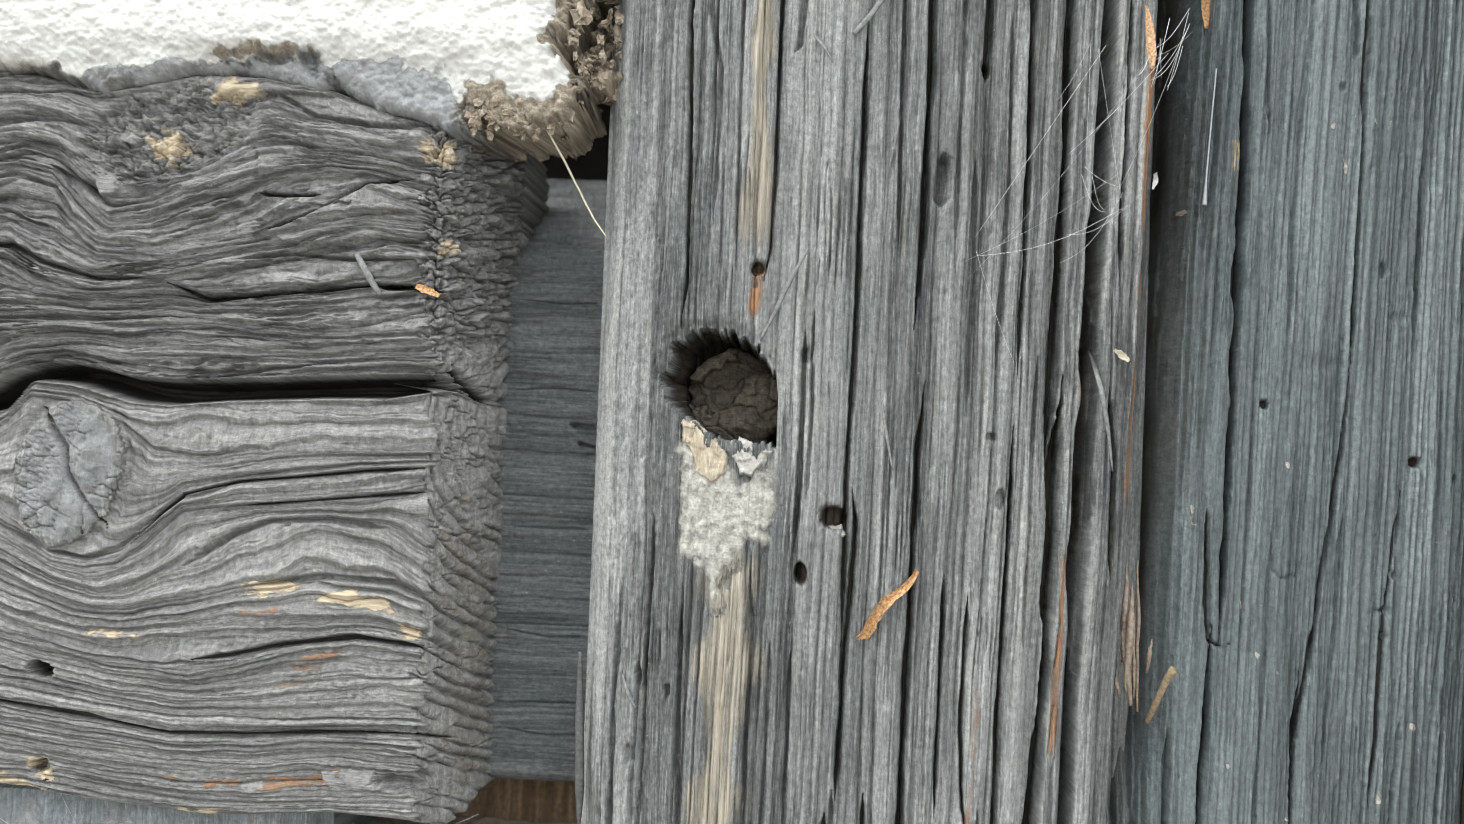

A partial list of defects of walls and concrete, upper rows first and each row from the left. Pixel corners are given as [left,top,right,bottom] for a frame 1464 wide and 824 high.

spalling [464,0,624,142]
crack [1360,3,1368,123]
crack [1347,253,1355,383]
crack [0,364,489,544]
crack [1288,440,1340,824]